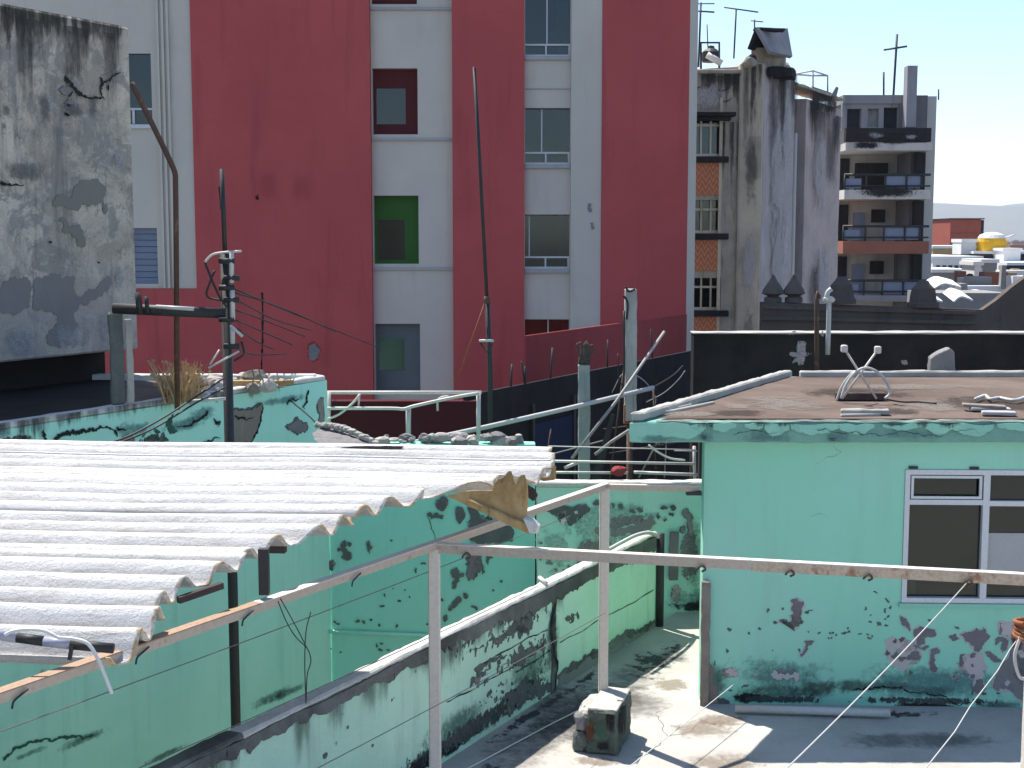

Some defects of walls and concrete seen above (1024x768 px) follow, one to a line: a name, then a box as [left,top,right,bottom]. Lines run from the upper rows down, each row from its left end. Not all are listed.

water stain [1,4,119,46]
crack [64,72,121,100]
water stain [810,87,837,206]
water stain [771,95,792,302]
spalling [234,402,264,443]
peeling [285,390,325,436]
peeling [629,422,1024,443]
peeling [182,496,699,768]
crack [448,590,653,702]
peeling [767,591,1024,703]
water stain [713,663,1009,718]
water stain [3,733,99,761]